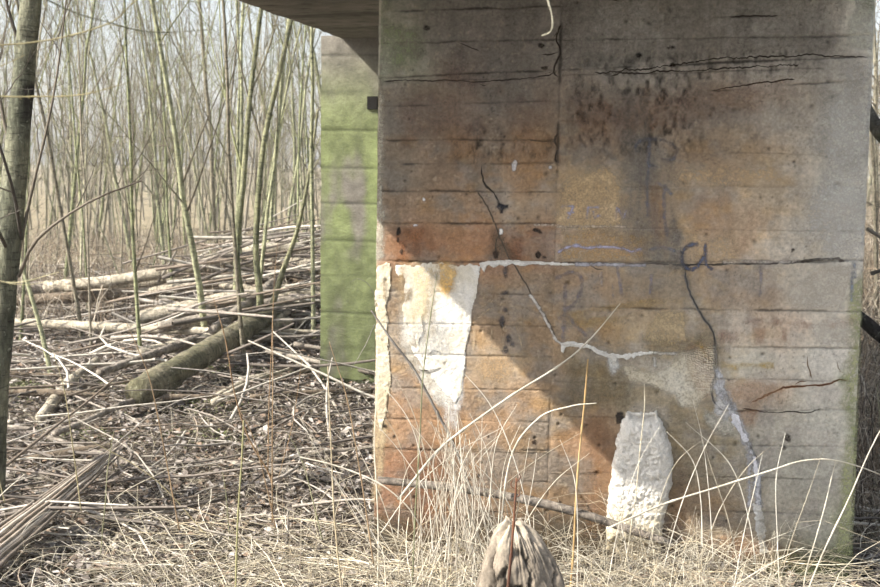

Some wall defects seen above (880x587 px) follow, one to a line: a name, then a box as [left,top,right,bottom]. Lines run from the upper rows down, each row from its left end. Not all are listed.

crack [384,25,561,86]
crack [595,53,868,91]
crack [731,12,777,20]
crack [477,166,555,335]
water stain [373,93,660,500]
water stain [529,294,768,555]
crack [561,257,847,504]